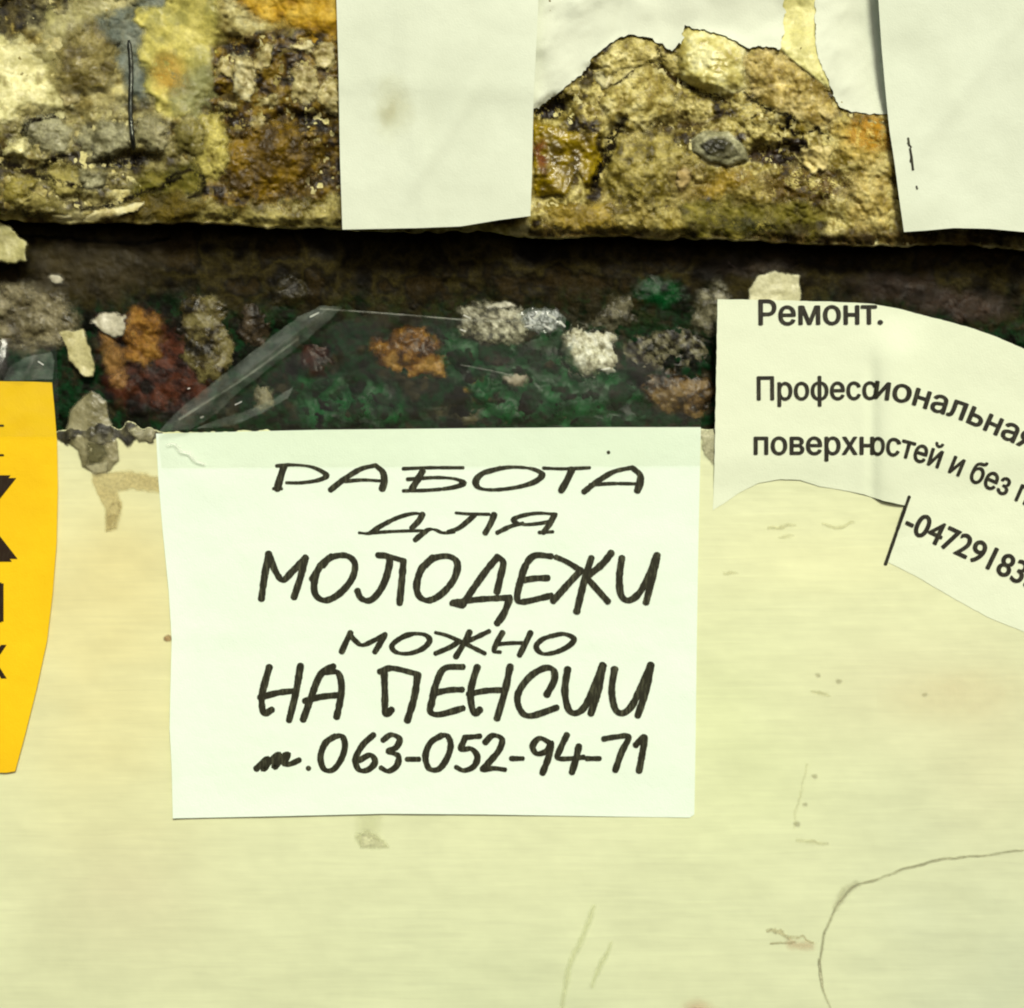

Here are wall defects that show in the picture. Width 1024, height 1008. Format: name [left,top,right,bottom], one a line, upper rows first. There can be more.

leakage [0,0,68,43]
leakage [98,0,167,101]
spalling [0,0,342,263]
spalling [528,0,915,245]
leakage [132,190,204,223]
peeling [60,312,126,376]
spalling [175,277,306,383]
leakage [460,301,562,345]
leakage [504,374,526,386]
spalling [562,285,730,464]
peeling [749,271,801,301]
crack [818,850,1024,992]